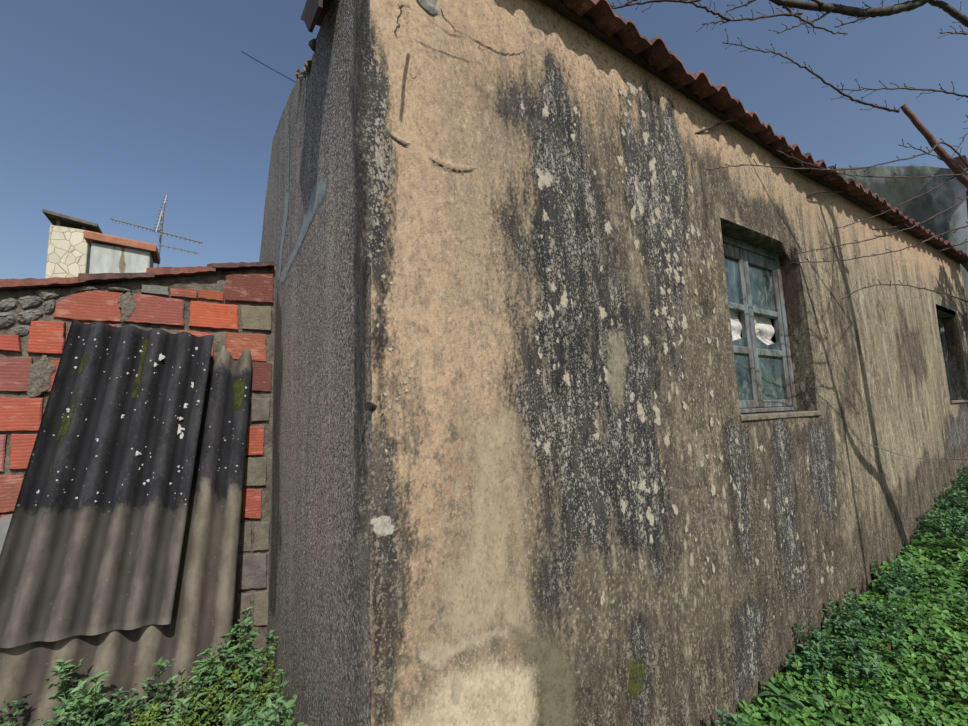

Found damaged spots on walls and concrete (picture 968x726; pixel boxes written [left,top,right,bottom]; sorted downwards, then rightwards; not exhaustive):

crack [394,4,525,63]
damp [349,0,423,716]
flaking render [373,403,574,726]
damp [487,49,798,640]
damp [572,244,968,726]